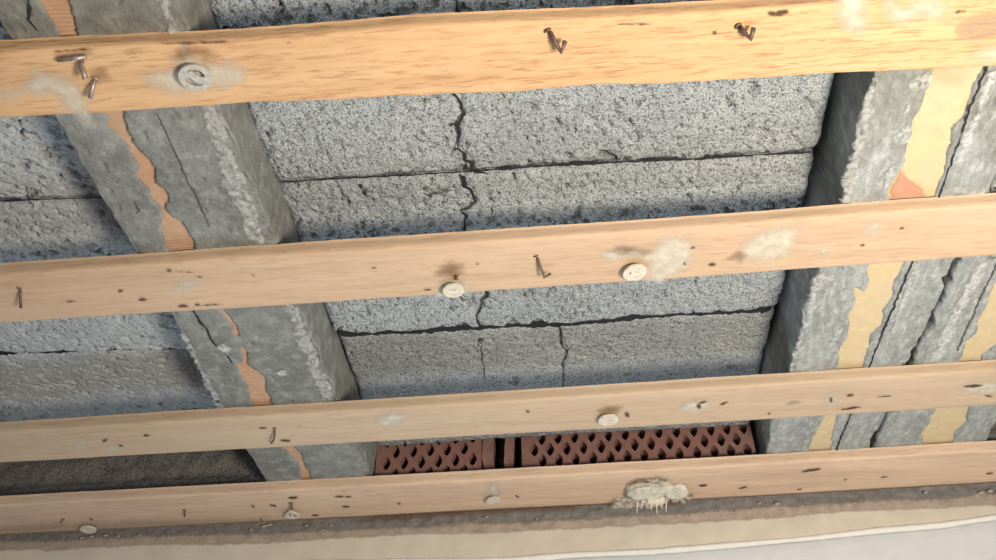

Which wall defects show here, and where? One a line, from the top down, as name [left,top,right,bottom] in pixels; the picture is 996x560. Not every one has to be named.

crack [157,115,210,227]
crack [424,93,489,231]
crack [192,310,233,364]
crack [476,291,495,382]
crack [559,323,568,386]